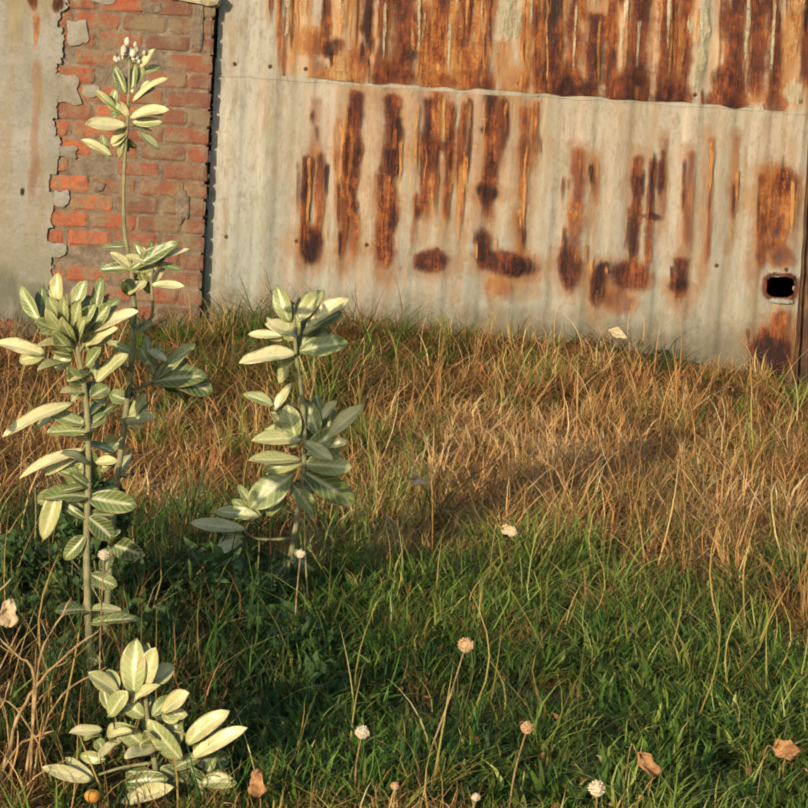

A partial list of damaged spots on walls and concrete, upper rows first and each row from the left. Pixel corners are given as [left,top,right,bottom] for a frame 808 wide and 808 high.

rust [700,0,808,111]
spalling [40,0,216,329]
rust [269,0,699,278]
rust [558,147,665,312]
rust [668,257,688,300]
rust [746,310,793,376]
rust [756,162,799,300]